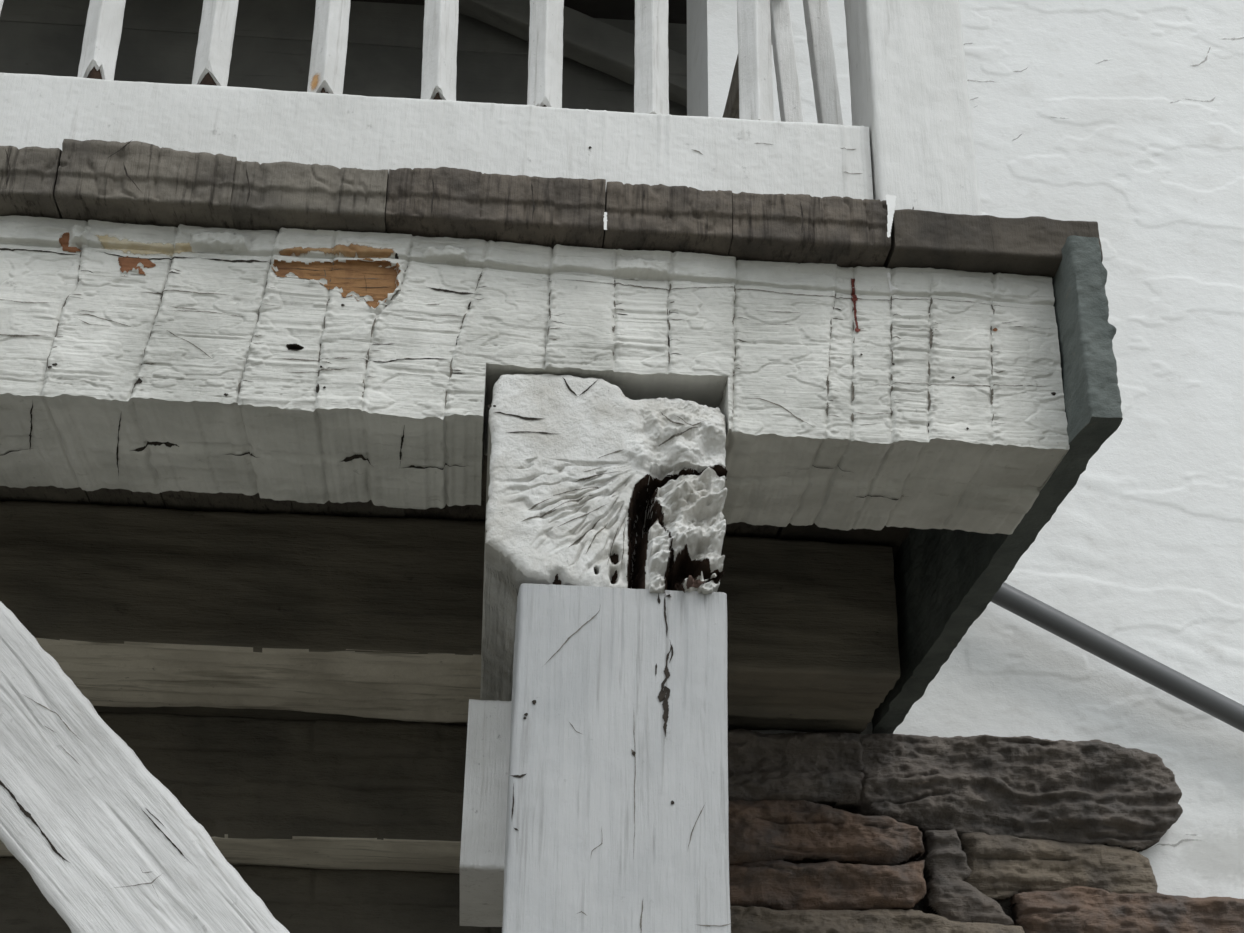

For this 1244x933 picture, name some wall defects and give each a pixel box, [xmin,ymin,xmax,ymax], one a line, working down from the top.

peeling [118,256,156,277]
peeling [267,253,401,314]
corrosion [851,278,860,332]
crack [0,248,486,476]
crack [521,450,626,565]
spalling [665,544,725,595]
crack [22,694,81,766]
crack [631,593,673,860]
crack [0,781,70,863]